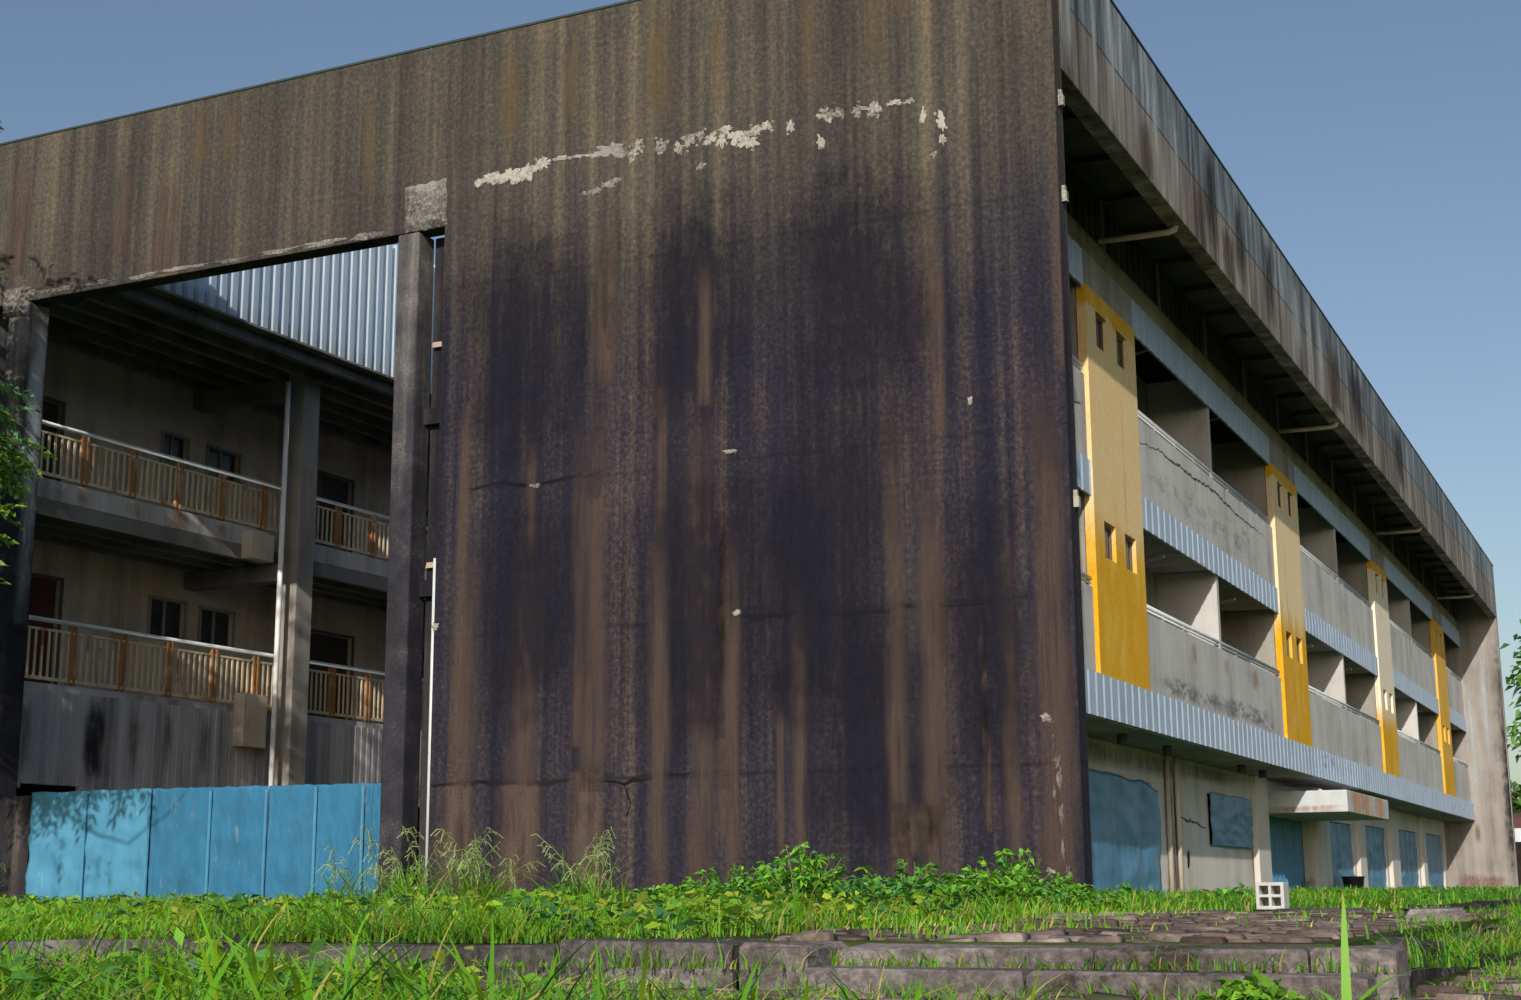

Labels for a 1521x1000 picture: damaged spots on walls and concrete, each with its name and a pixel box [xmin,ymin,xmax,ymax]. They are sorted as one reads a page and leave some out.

damp [1092,14,1114,81]
peeling [474,119,795,197]
peeling [815,97,948,159]
damp [1206,166,1215,232]
damp [1235,209,1244,265]
damp [654,218,732,399]
damp [801,197,923,387]
damp [1293,291,1323,373]
crack [1139,441,1263,536]
damp [646,485,762,730]
damp [85,715,104,770]
corrosion [652,590,668,887]